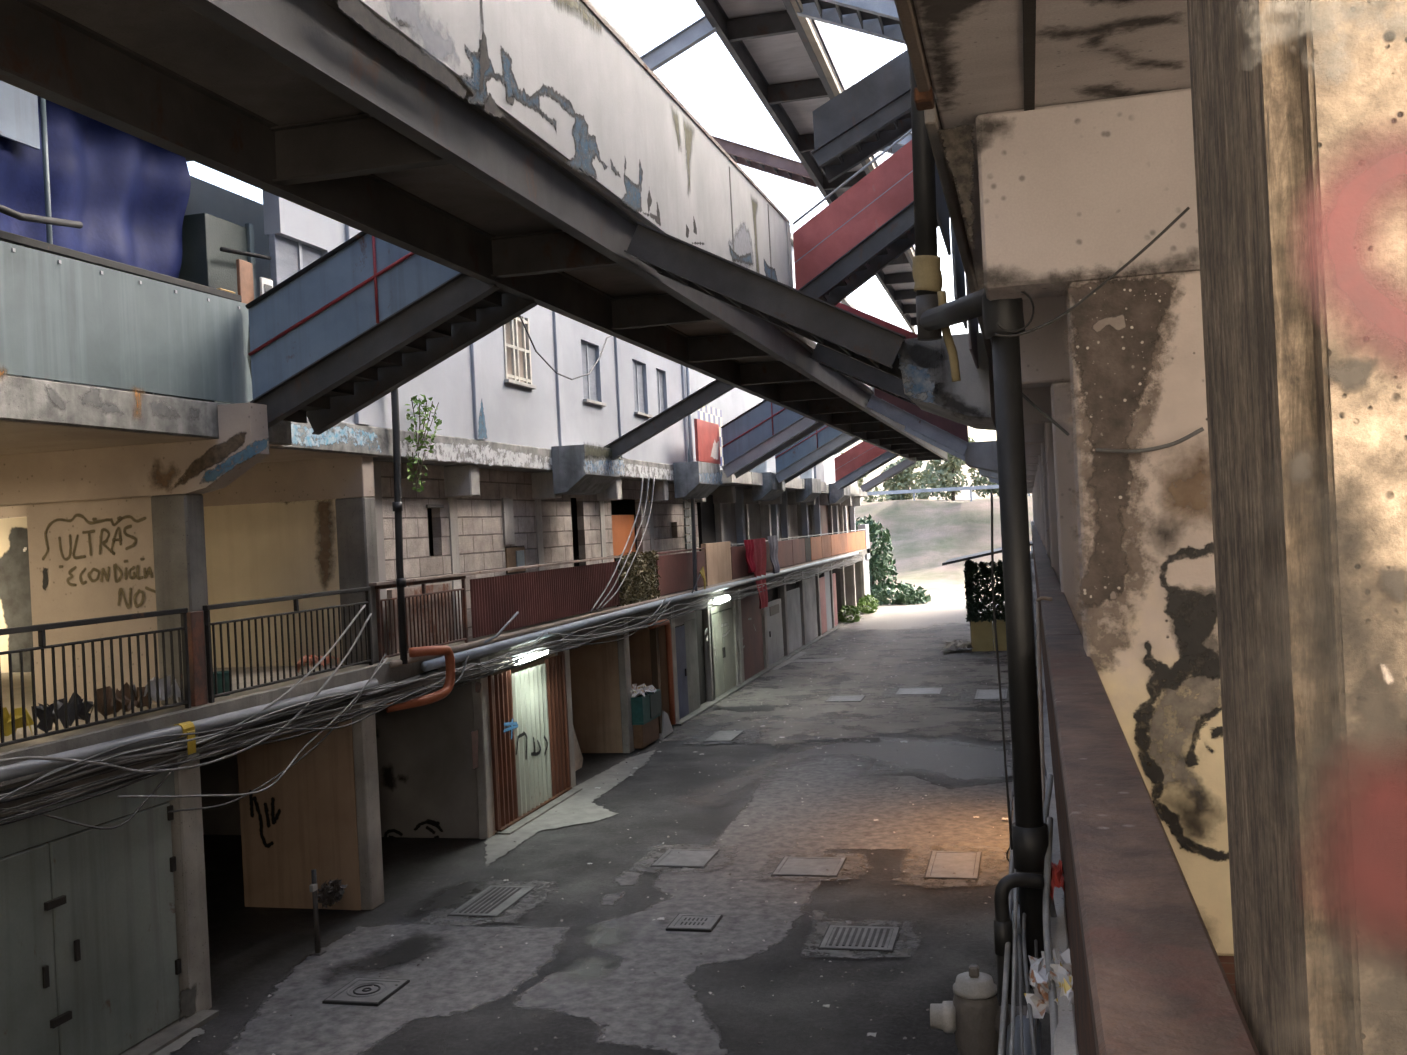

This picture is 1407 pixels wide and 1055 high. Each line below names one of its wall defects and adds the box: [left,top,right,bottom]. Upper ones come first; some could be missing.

peeling [729,246,778,281]
spalling [174,432,269,488]
water stain [316,499,333,587]